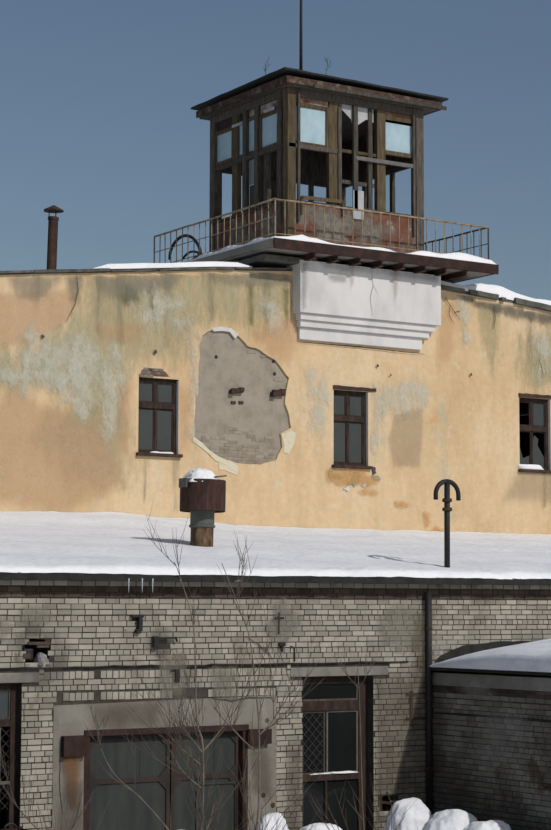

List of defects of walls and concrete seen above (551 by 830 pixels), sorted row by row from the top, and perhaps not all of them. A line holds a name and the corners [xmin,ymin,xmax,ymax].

leakage [1,327,125,437]
spalling [139,368,169,377]
flaking render [192,326,296,475]
peeling [343,467,381,491]
spalling [22,639,50,666]